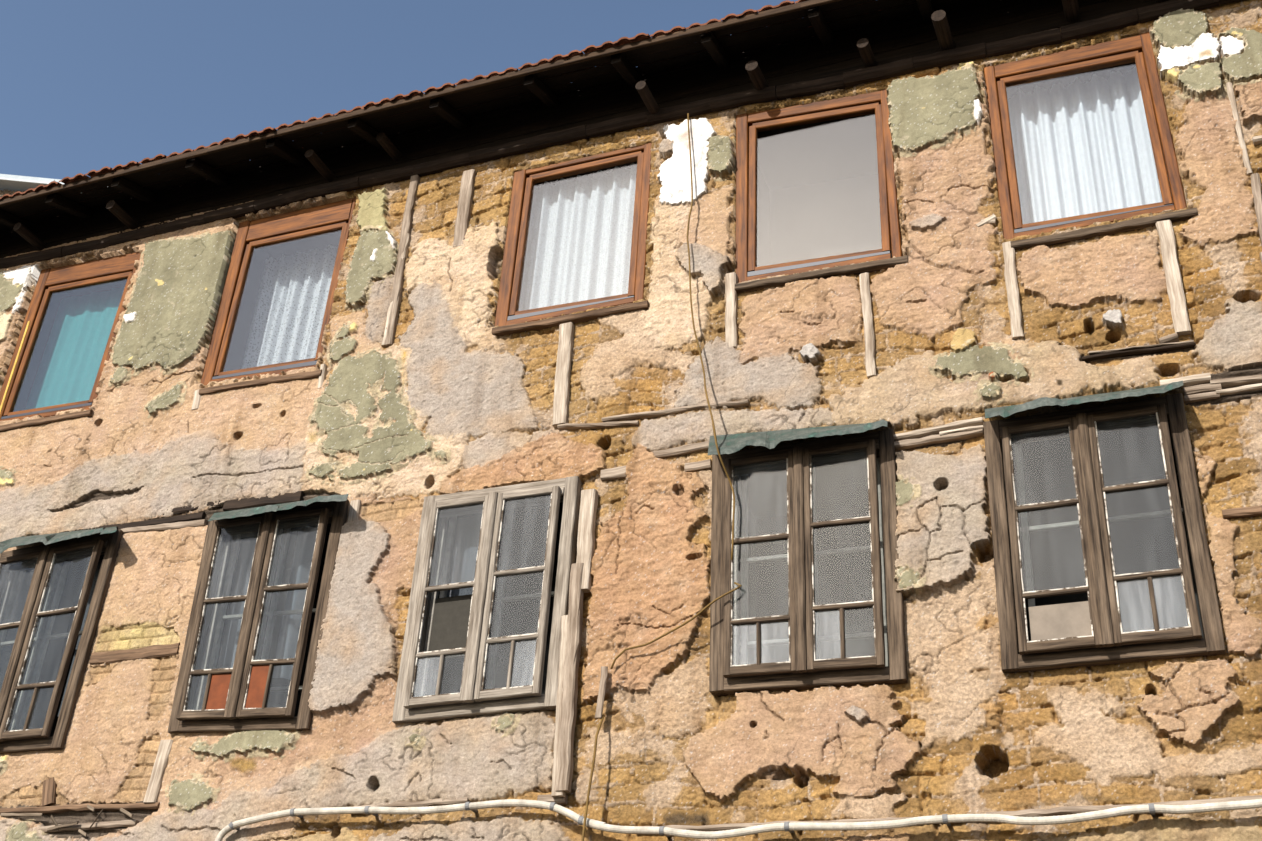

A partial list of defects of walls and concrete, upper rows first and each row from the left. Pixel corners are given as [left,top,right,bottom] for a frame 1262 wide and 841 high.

spalling [494,304,559,428]
spalling [570,309,699,450]
spalling [789,271,882,377]
spalling [934,239,1175,397]
spalling [1174,224,1262,338]
crack [898,496,987,579]
spalling [1155,362,1262,624]
spalling [566,471,845,834]
crack [760,691,785,739]
crack [822,716,910,770]
spalling [972,642,1262,812]
crack [1157,661,1230,735]